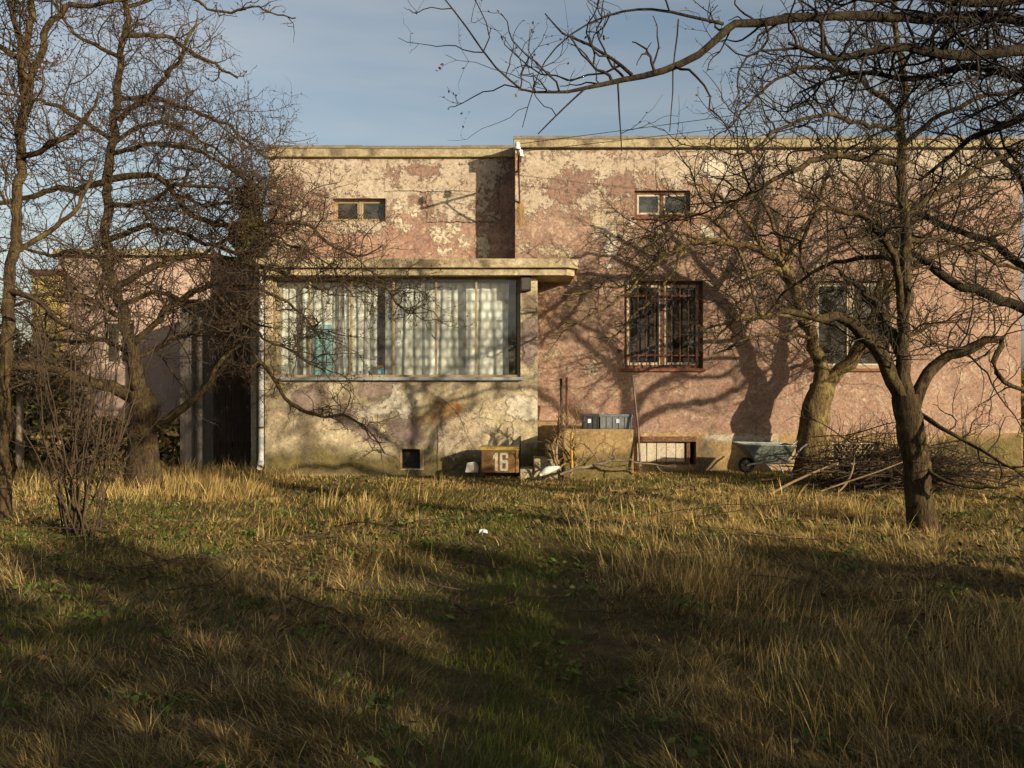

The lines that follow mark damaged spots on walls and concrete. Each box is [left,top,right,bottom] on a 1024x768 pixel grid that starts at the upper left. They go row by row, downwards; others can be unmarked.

peeling [269,149,1019,270]
peeling [351,382,418,427]
peeling [435,384,538,464]